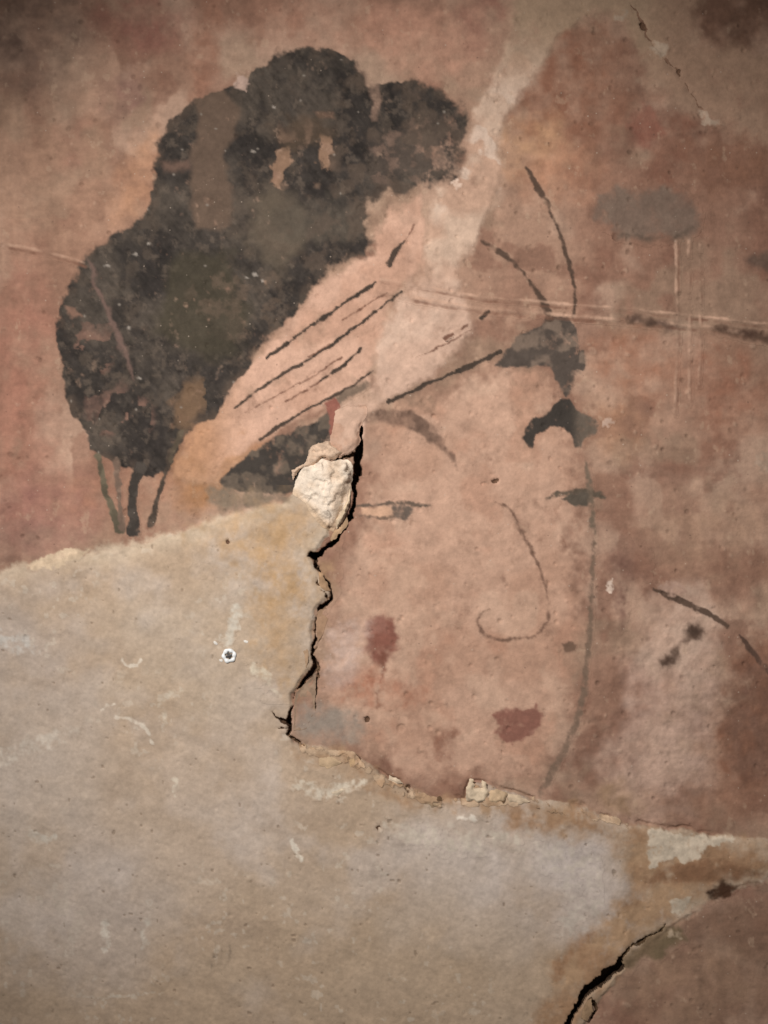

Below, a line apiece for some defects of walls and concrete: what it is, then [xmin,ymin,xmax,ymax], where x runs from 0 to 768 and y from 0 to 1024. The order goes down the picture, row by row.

spalling [25,547,91,572]
crack [273,426,363,745]
spalling [604,577,616,595]
spalling [654,579,691,602]
spalling [299,743,563,814]
spalling [644,826,736,871]
spalling [666,895,693,941]
crack [564,924,666,1024]